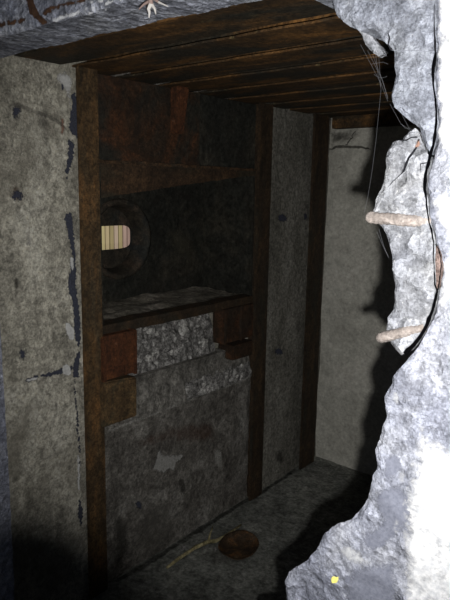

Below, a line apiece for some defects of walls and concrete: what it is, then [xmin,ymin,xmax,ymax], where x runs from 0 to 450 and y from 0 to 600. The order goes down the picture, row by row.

corrosion [0,0,85,27]
spalling [358,30,387,58]
peeling [438,0,450,153]
crack [330,131,369,150]
crack [375,0,442,355]
spalling [365,211,431,227]
peeling [434,194,450,234]
spalling [435,246,450,306]
crack [25,212,81,466]
spalling [376,324,427,343]
crack [76,500,84,526]